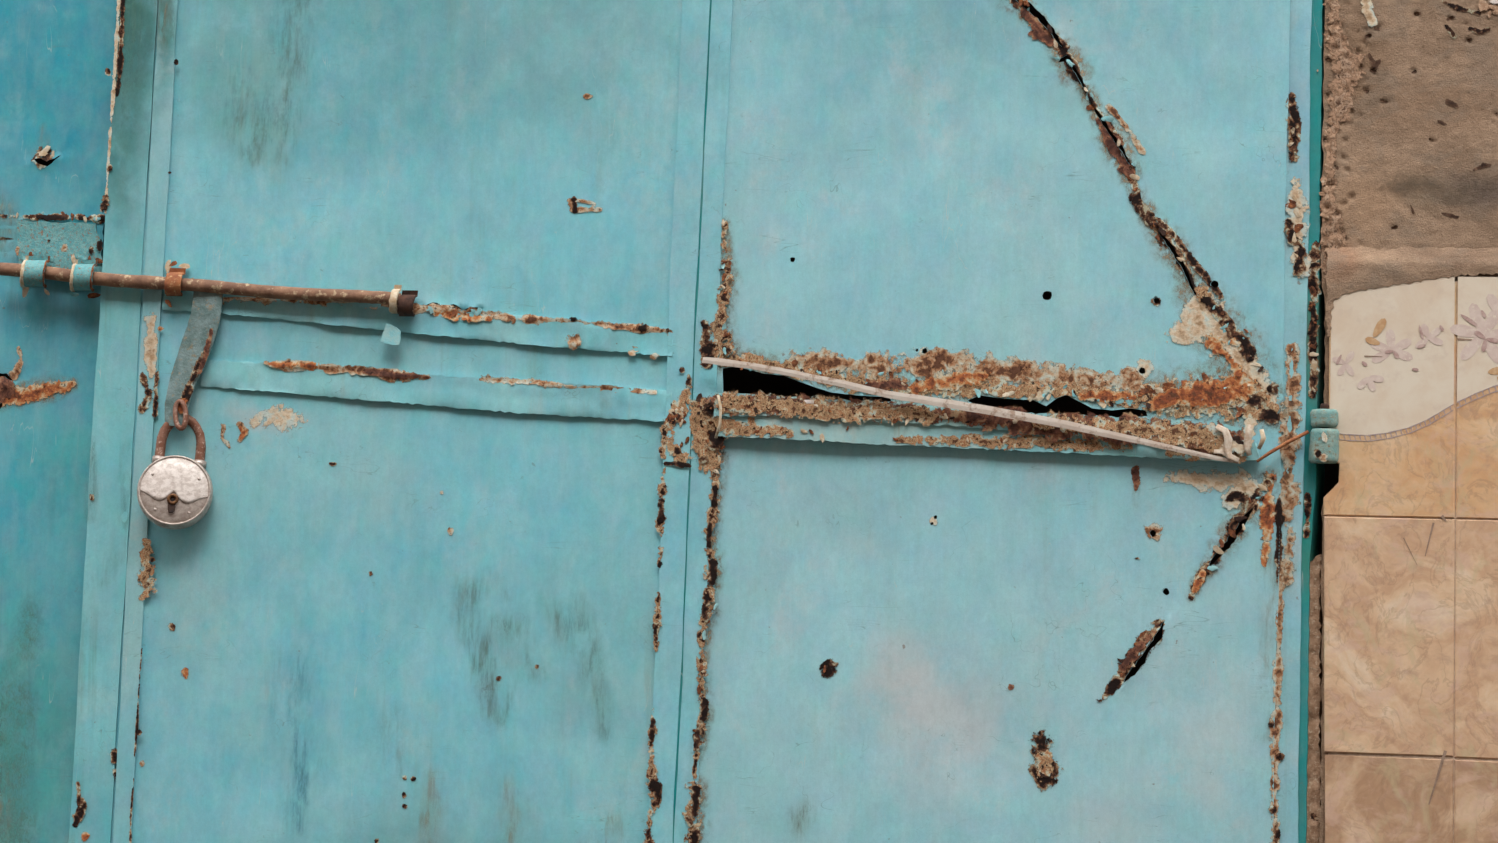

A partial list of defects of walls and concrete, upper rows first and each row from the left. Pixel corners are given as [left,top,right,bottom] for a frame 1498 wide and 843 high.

rust [1307,241,1321,398]
rust [1303,492,1312,538]